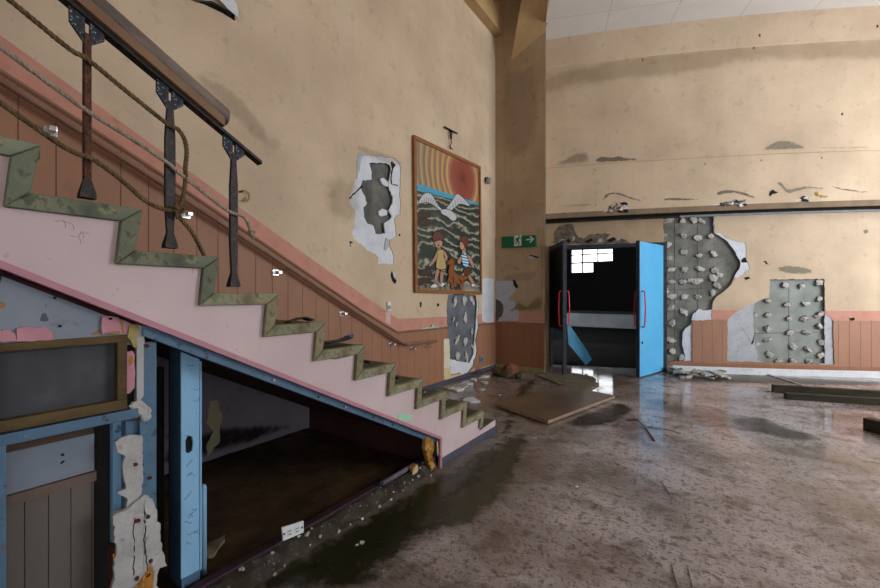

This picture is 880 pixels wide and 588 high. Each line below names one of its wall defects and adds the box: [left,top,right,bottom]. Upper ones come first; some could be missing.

spalling [349,153,401,284]
flaking render [553,224,629,245]
flaking render [603,202,629,213]
flaking render [715,199,747,207]
peeling [0,326,53,342]
spalling [421,278,519,381]
spalling [663,217,751,361]
spalling [727,279,834,365]
leakage [737,418,812,439]
peeling [107,434,167,588]